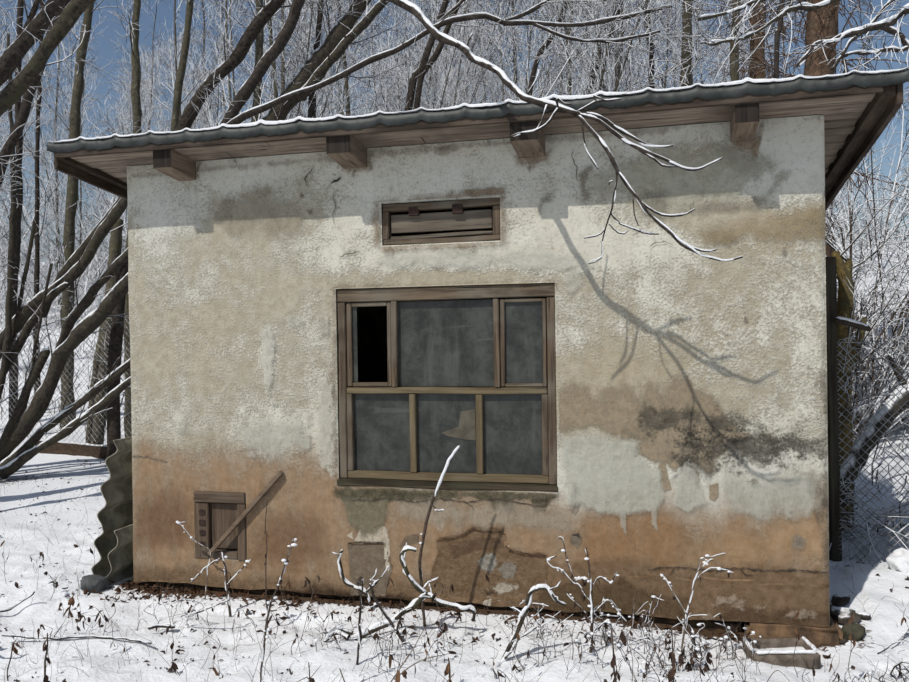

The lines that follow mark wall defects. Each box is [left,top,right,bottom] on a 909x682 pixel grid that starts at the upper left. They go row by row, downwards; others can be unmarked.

damp [638,407,824,477]
peeling [347,526,419,571]
spalling [431,526,547,606]